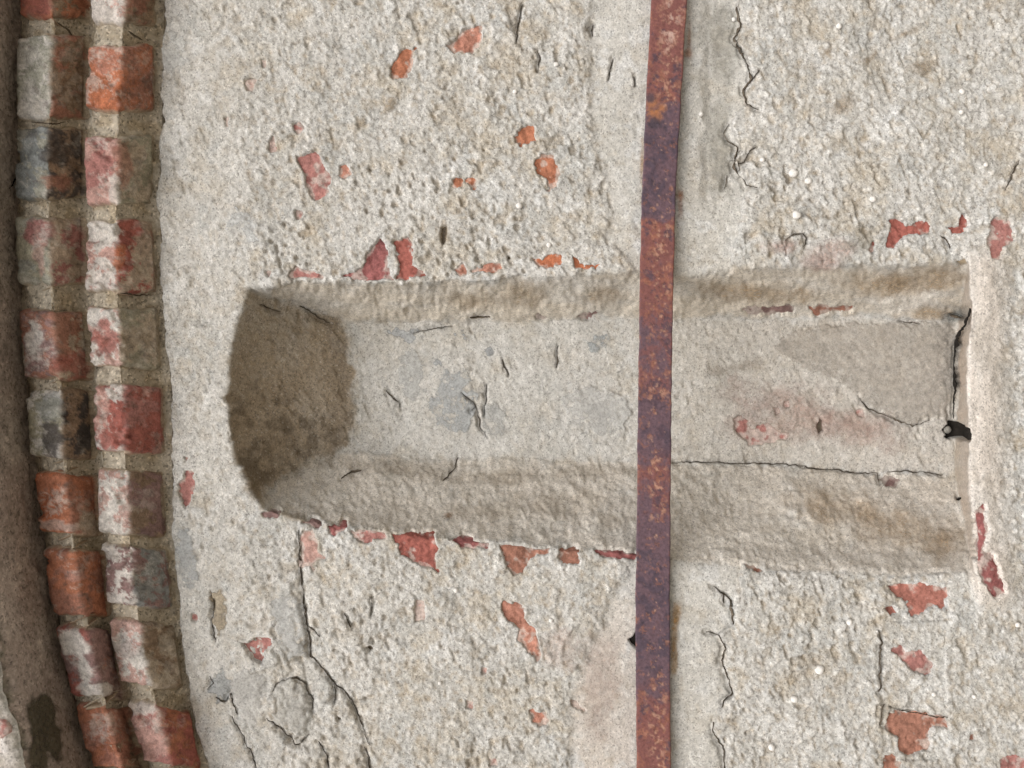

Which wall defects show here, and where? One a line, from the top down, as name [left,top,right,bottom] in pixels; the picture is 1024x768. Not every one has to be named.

crack [733,7,760,110]
crack [723,124,757,189]
spalling [343,237,426,281]
crack [860,308,971,427]
crack [678,461,941,482]
spalling [299,518,440,573]
spalling [453,535,580,575]
spalling [974,504,1004,597]
spalling [884,582,948,616]
crack [266,530,370,768]
crack [209,676,257,768]
spalling [883,710,947,768]